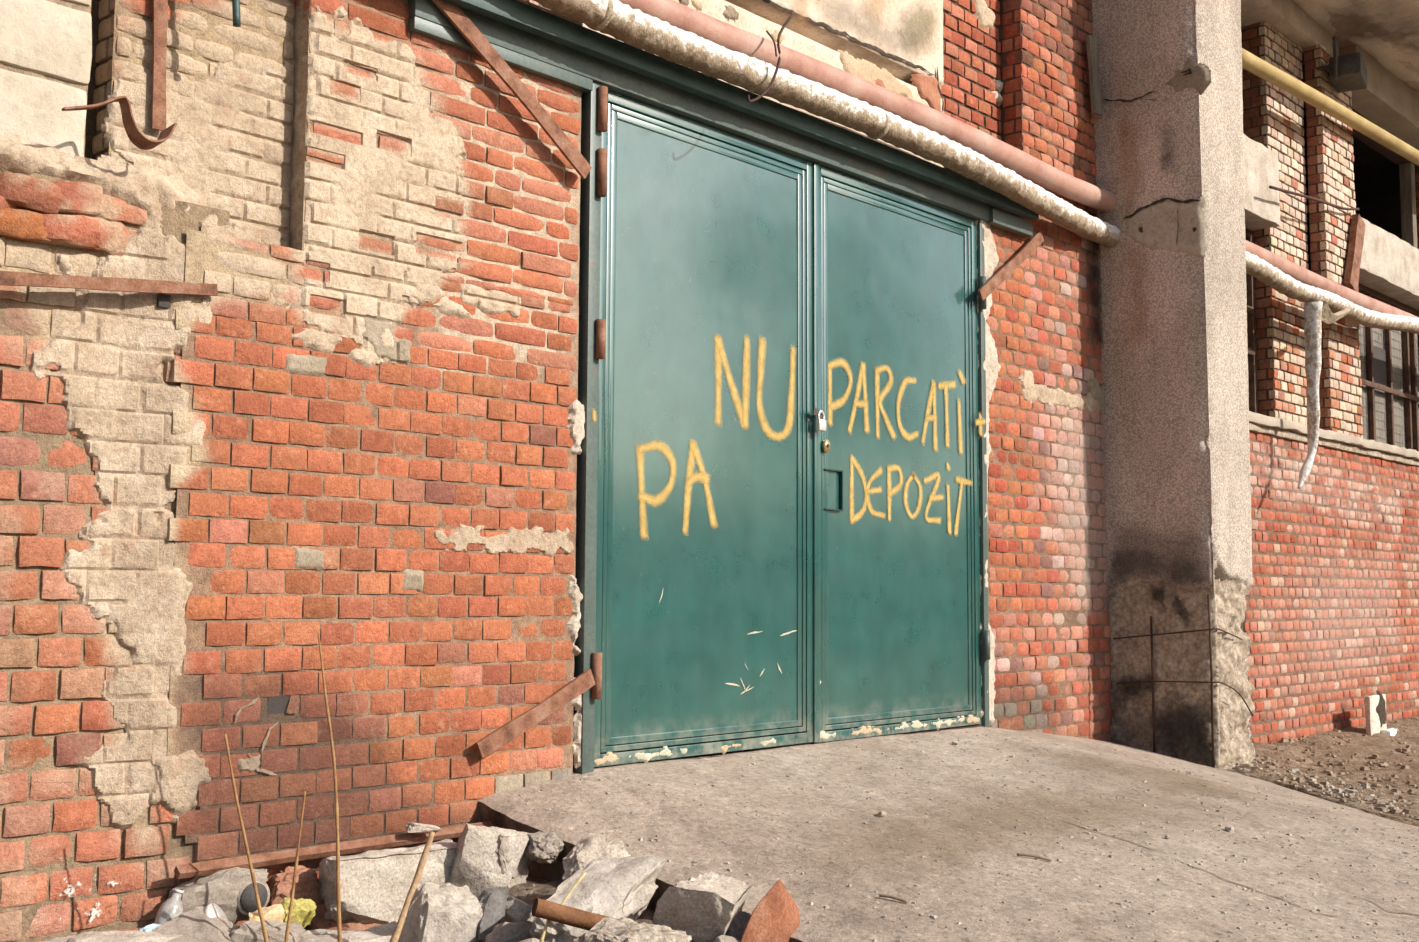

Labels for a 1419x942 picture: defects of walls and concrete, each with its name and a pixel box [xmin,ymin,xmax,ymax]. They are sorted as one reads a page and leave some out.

crack [1104,91,1158,102]
spalling [1165,58,1211,95]
crack [1124,197,1200,245]
peeling [976,220,1001,536]
spalling [0,5,472,831]
leakage [1113,554,1207,584]
spalling [1108,540,1255,770]
peeling [820,622,996,739]
peeling [594,746,687,765]